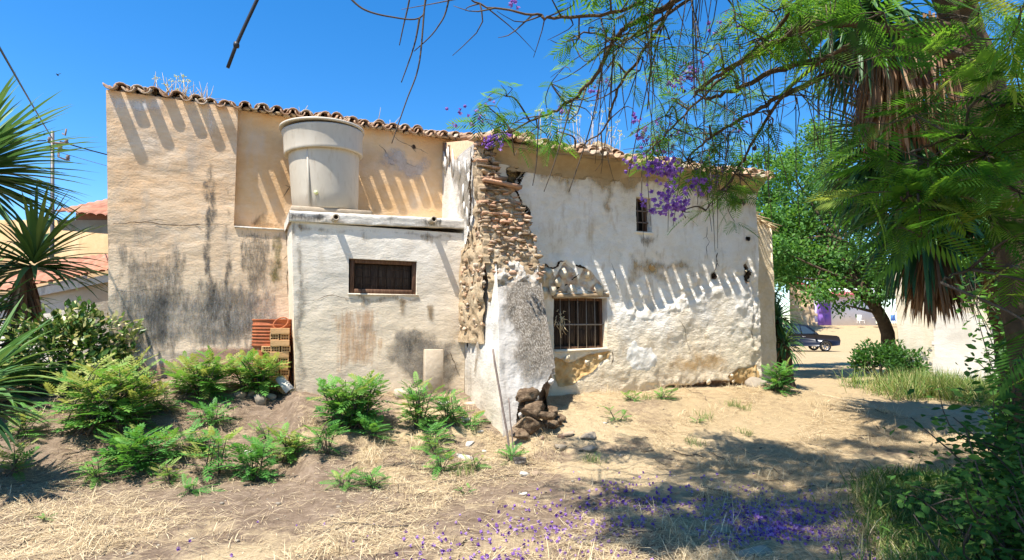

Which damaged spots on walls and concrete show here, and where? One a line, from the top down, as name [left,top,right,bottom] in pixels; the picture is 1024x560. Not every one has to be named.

damp [116,248,188,354]
damp [196,169,281,347]
spalling [442,133,604,331]
damp [388,329,458,389]
spalling [516,351,610,420]